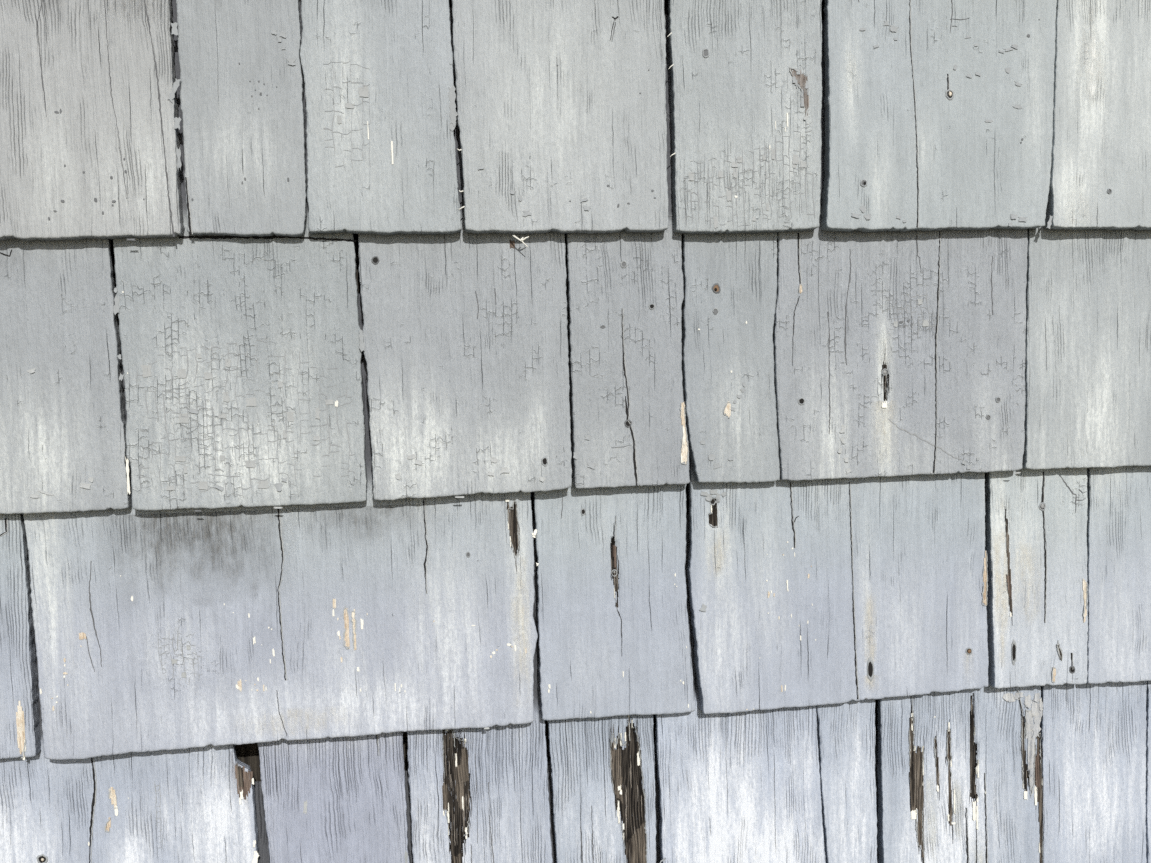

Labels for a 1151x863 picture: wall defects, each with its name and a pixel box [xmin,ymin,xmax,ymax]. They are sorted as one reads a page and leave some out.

crack [136,340,355,735]
peeling [909,710,955,862]
peeling [1003,692,1044,863]